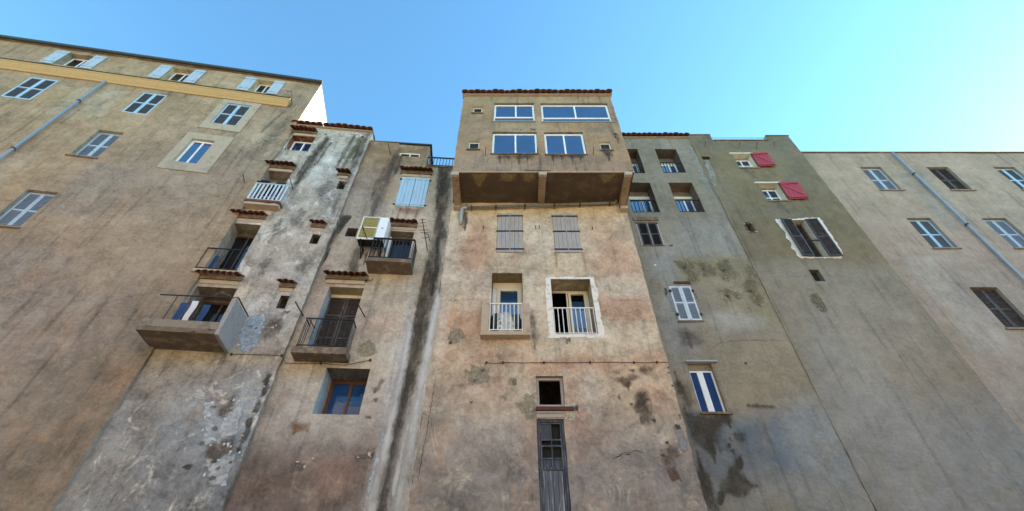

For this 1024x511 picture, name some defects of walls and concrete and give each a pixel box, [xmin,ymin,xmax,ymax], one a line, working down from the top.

peeling [237,307,265,352]
damp [367,167,452,511]
peeling [199,374,271,486]
damp [618,367,656,423]
damp [686,413,758,511]